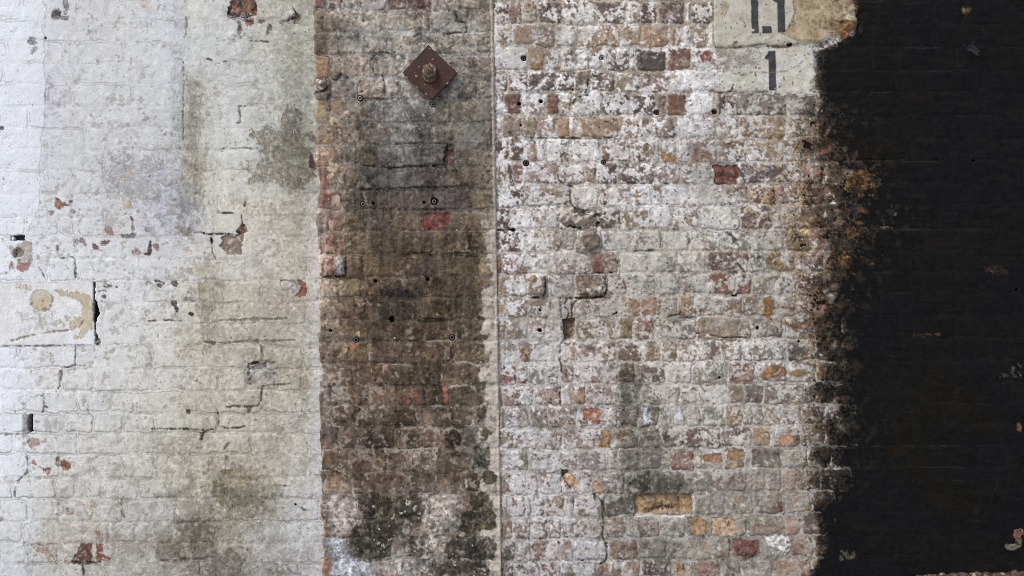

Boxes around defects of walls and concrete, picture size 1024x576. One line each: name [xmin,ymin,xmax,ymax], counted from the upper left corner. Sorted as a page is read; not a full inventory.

spalling [227,0,301,38]
water stain [247,109,316,189]
spalling [198,202,248,259]
spalling [9,240,33,293]
peeling [280,280,307,297]
crack [154,384,285,449]
water stain [323,407,497,576]
spalling [31,501,111,566]